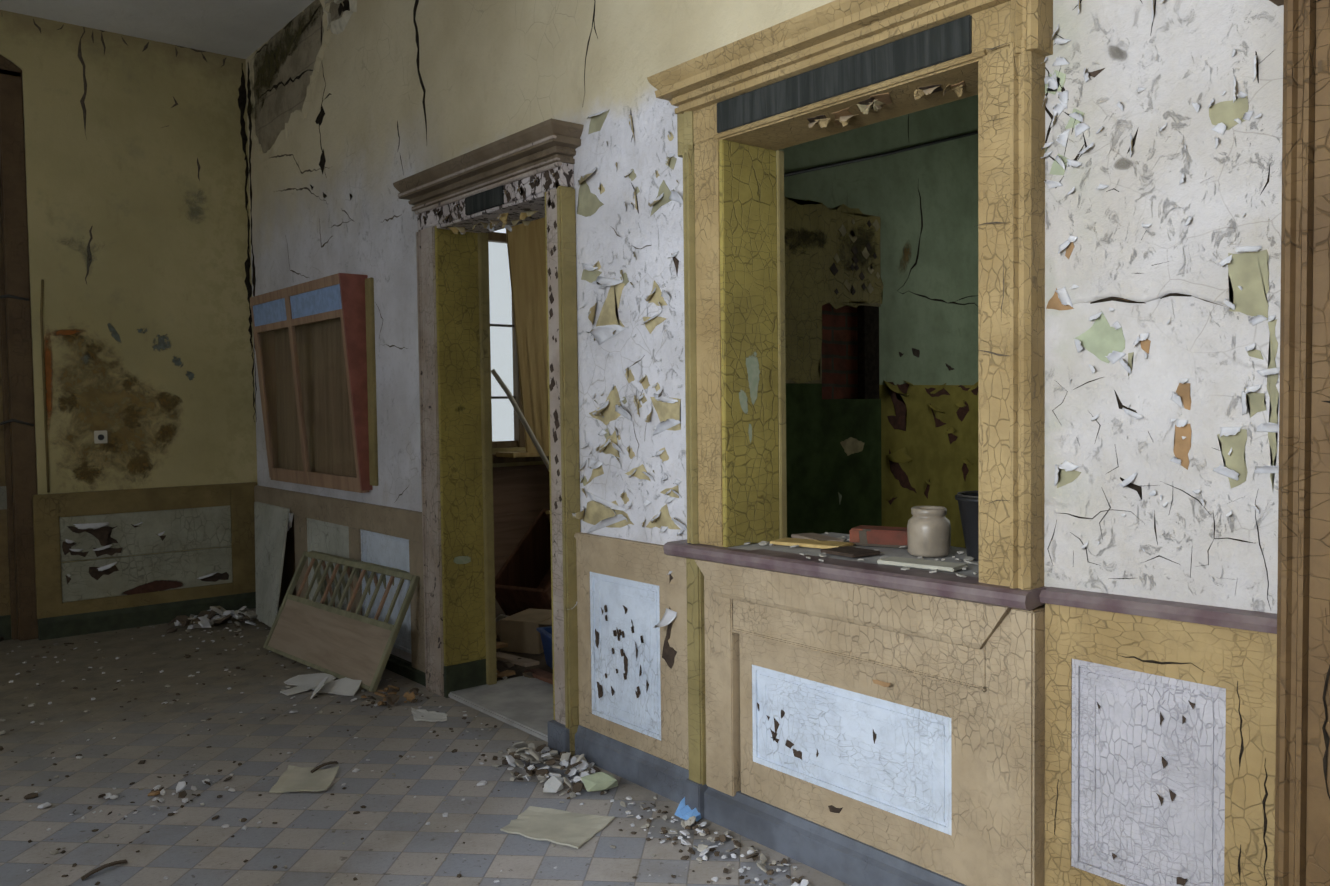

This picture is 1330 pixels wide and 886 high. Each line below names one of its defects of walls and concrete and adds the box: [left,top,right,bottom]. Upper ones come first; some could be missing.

crack [397,0,427,175]
crack [582,0,598,107]
damp [54,334,181,483]
crack [33,8,402,422]
peeling [554,366,687,536]
flaking render [776,197,884,384]
crack [1047,377,1271,609]
peeling [1170,378,1192,470]
peeling [1212,246,1280,490]
peeling [595,605,677,698]
peeling [757,703,819,760]
crack [1322,666,1330,799]